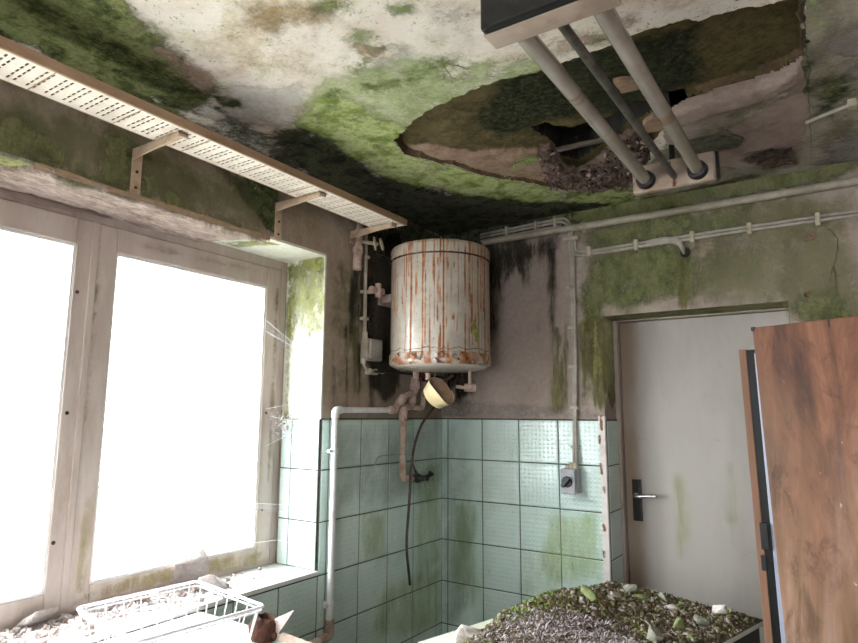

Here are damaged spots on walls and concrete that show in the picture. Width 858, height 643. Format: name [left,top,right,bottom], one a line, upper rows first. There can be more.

peeling [154,47,214,91]
damp [126,146,278,232]
peeling [353,44,383,57]
flaking render [394,70,633,196]
flaking render [558,36,664,165]
flaking render [631,0,805,106]
damp [641,0,858,200]
damp [158,95,614,416]
damp [662,201,857,314]